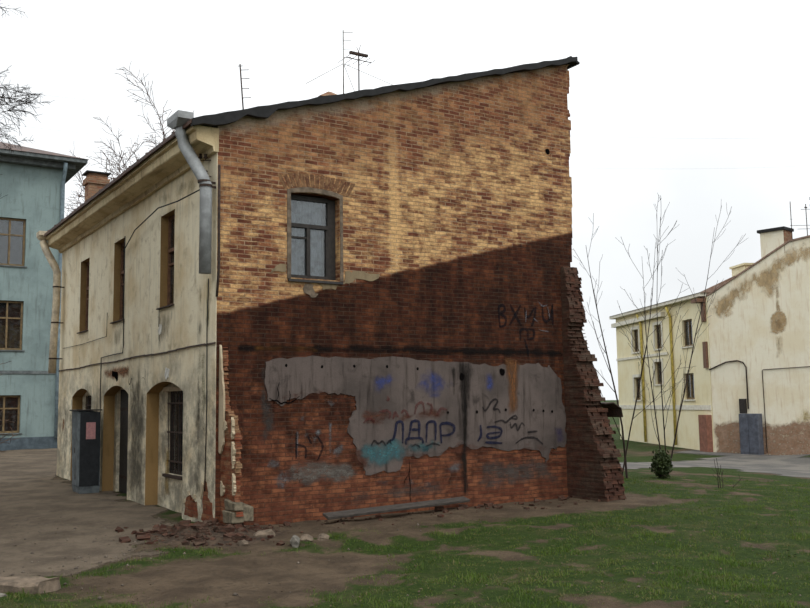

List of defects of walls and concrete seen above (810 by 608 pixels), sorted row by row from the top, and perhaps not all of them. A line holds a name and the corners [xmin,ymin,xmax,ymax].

water stain [715,248,810,316]
peeling [264,355,567,475]
flaking render [182,482,213,521]